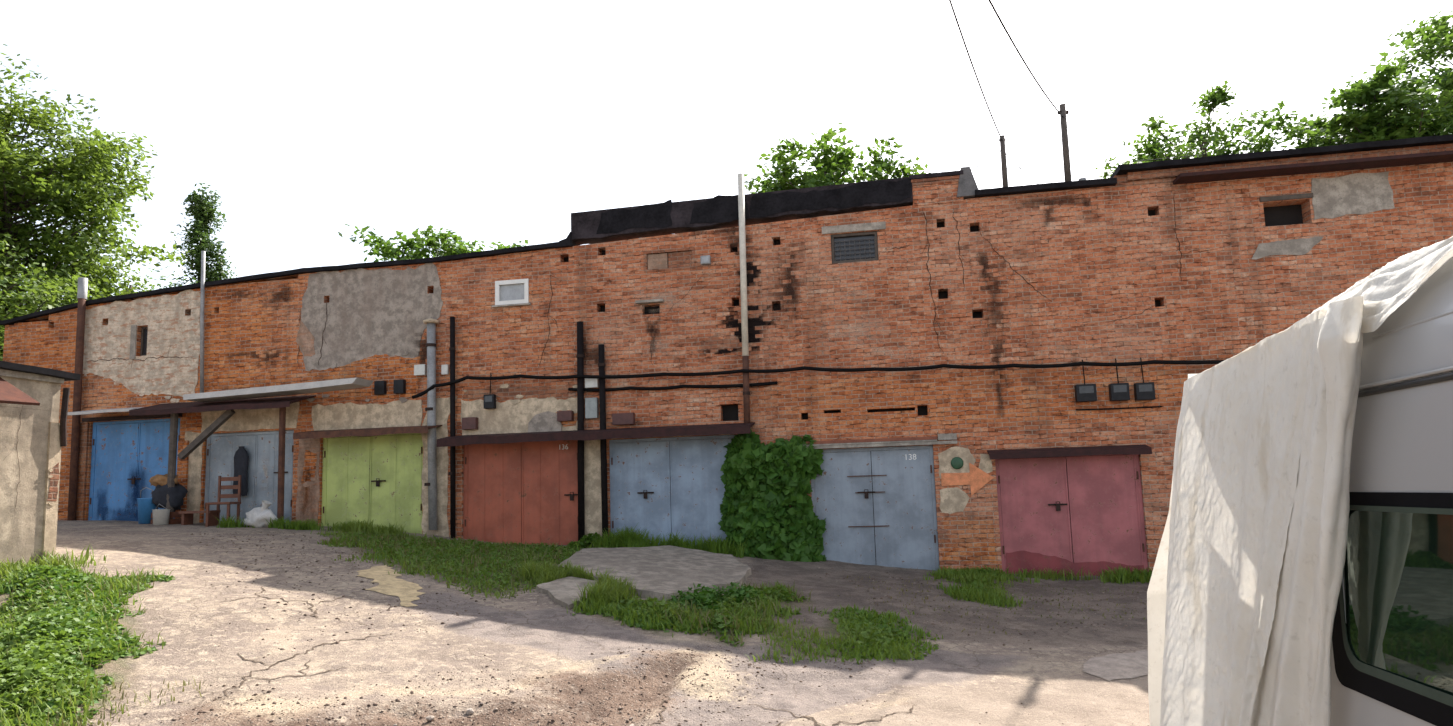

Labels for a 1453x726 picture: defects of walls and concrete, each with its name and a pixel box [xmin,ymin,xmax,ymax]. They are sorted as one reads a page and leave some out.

leakage [707,236,773,354]
leakage [781,271,797,310]
crack [892,209,1052,353]
leakage [980,256,1002,320]
spalling [305,350,421,403]